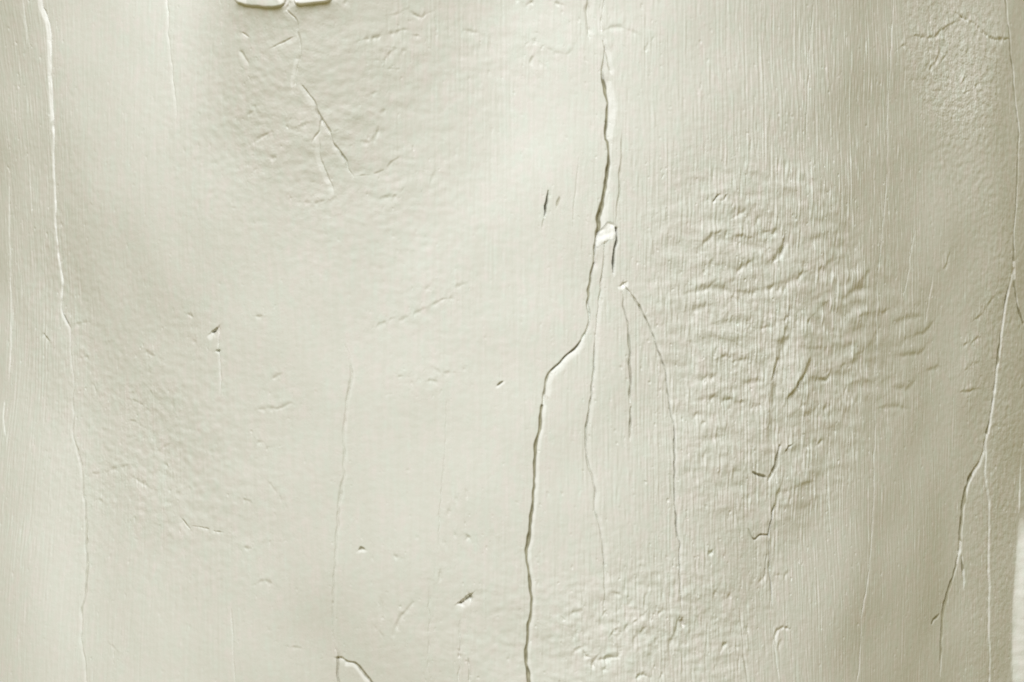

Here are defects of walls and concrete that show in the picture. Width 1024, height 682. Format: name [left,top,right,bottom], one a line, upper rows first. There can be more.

crack [33,0,95,682]
crack [515,0,690,682]
crack [927,0,1024,682]